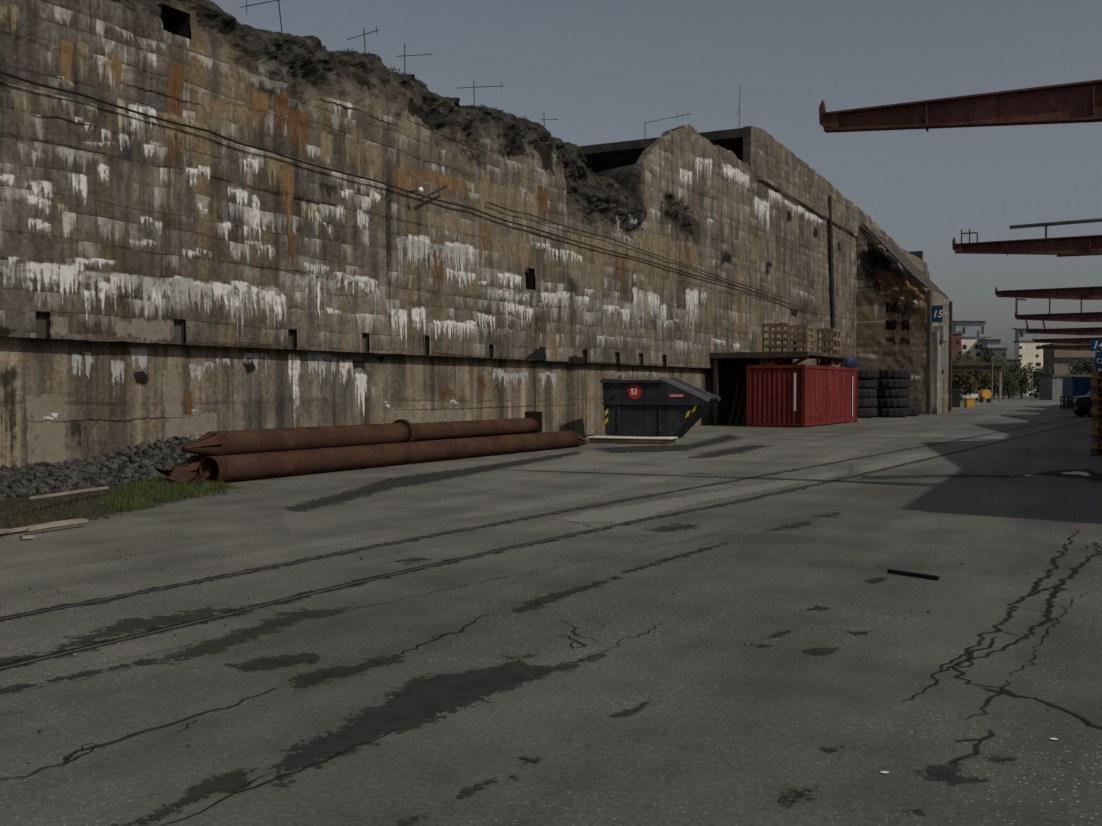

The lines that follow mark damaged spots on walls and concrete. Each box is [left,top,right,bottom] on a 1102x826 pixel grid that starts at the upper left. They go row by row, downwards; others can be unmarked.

leakage [87,99,157,145]
rust [265,153,295,260]
leakage [755,189,822,230]
leakage [0,174,589,348]
leakage [603,274,707,344]
leakage [111,347,148,386]
leakage [288,351,390,414]
leakage [0,606,405,694]
crack [904,529,1102,764]
crack [0,687,277,780]
crack [159,726,396,826]
leakage [112,653,608,826]